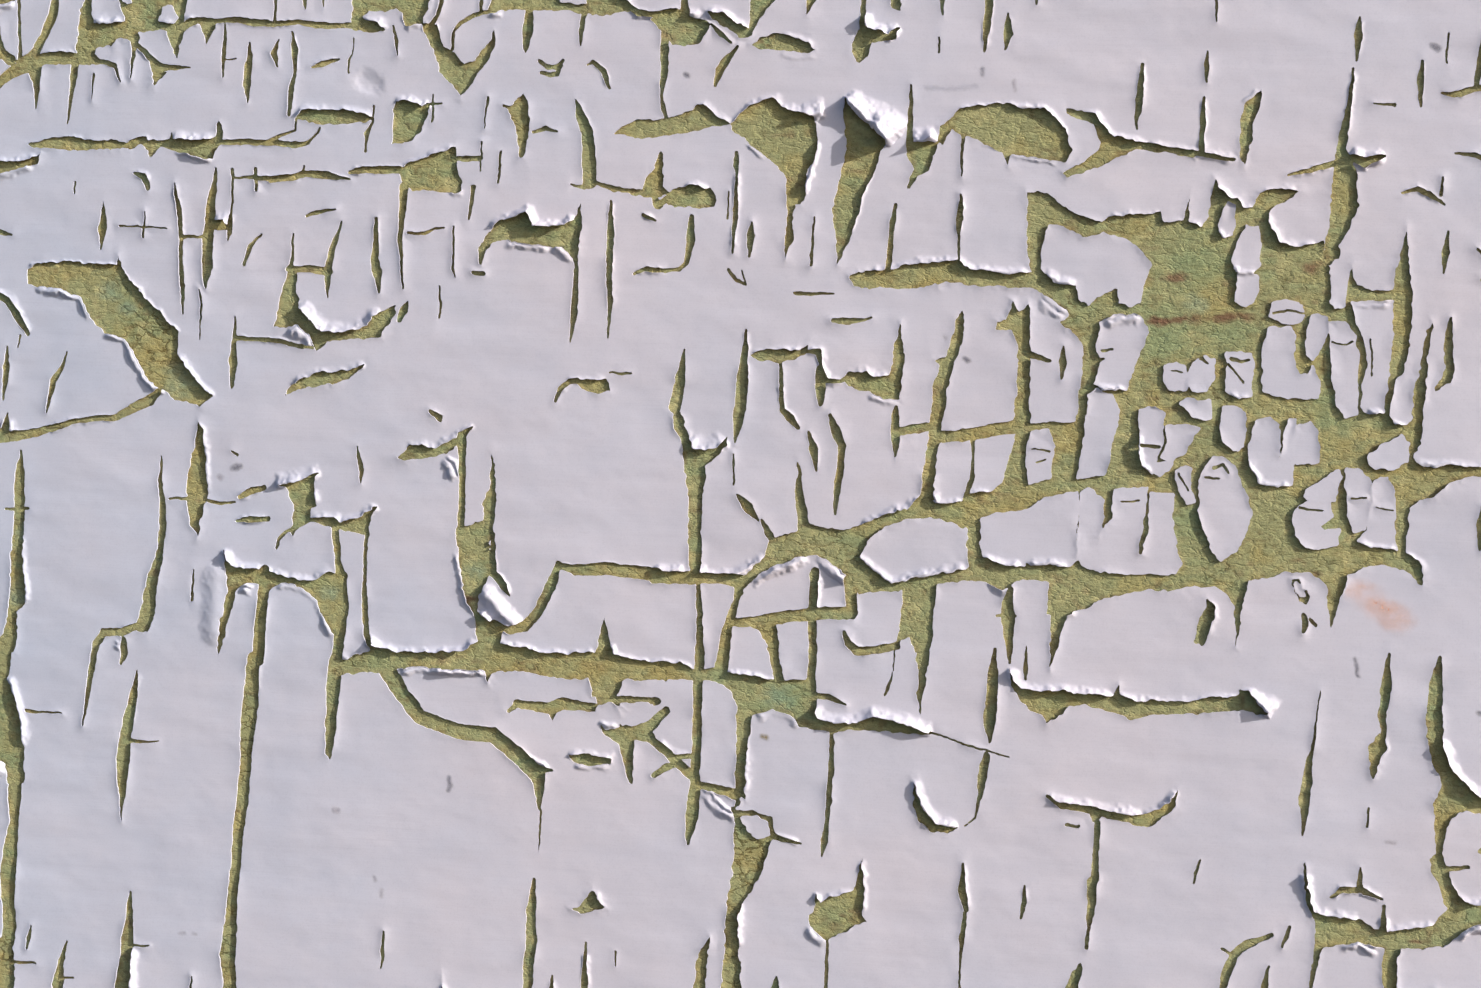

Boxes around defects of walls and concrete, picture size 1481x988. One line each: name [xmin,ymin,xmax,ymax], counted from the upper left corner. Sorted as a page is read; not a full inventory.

peeling [27,202,214,413]
peeling [76,0,191,85]
peeling [243,42,253,103]
peeling [268,105,483,351]
peeling [351,0,824,342]
peeling [852,0,902,63]
peeling [832,84,1073,263]
peeling [1134,63,1147,130]
peeling [1239,90,1262,164]
peeling [169,180,1481,988]
peeling [0,450,62,988]
peeling [115,891,149,988]